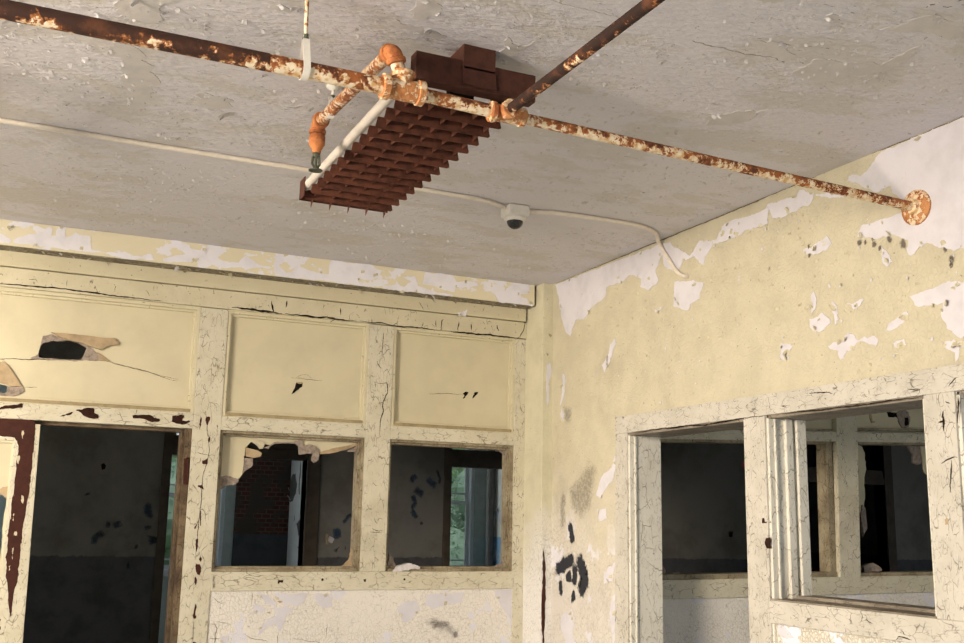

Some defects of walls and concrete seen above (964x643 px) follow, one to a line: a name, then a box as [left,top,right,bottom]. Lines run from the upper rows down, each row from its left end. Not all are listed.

peeling [528,0,964,362]
crack [0,279,160,301]
peeling [0,146,851,423]
crack [99,360,178,381]
crack [232,301,527,425]
crack [642,389,923,432]
crack [938,378,964,431]
crack [941,457,954,492]
peeling [0,403,36,629]
peeling [249,580,309,636]